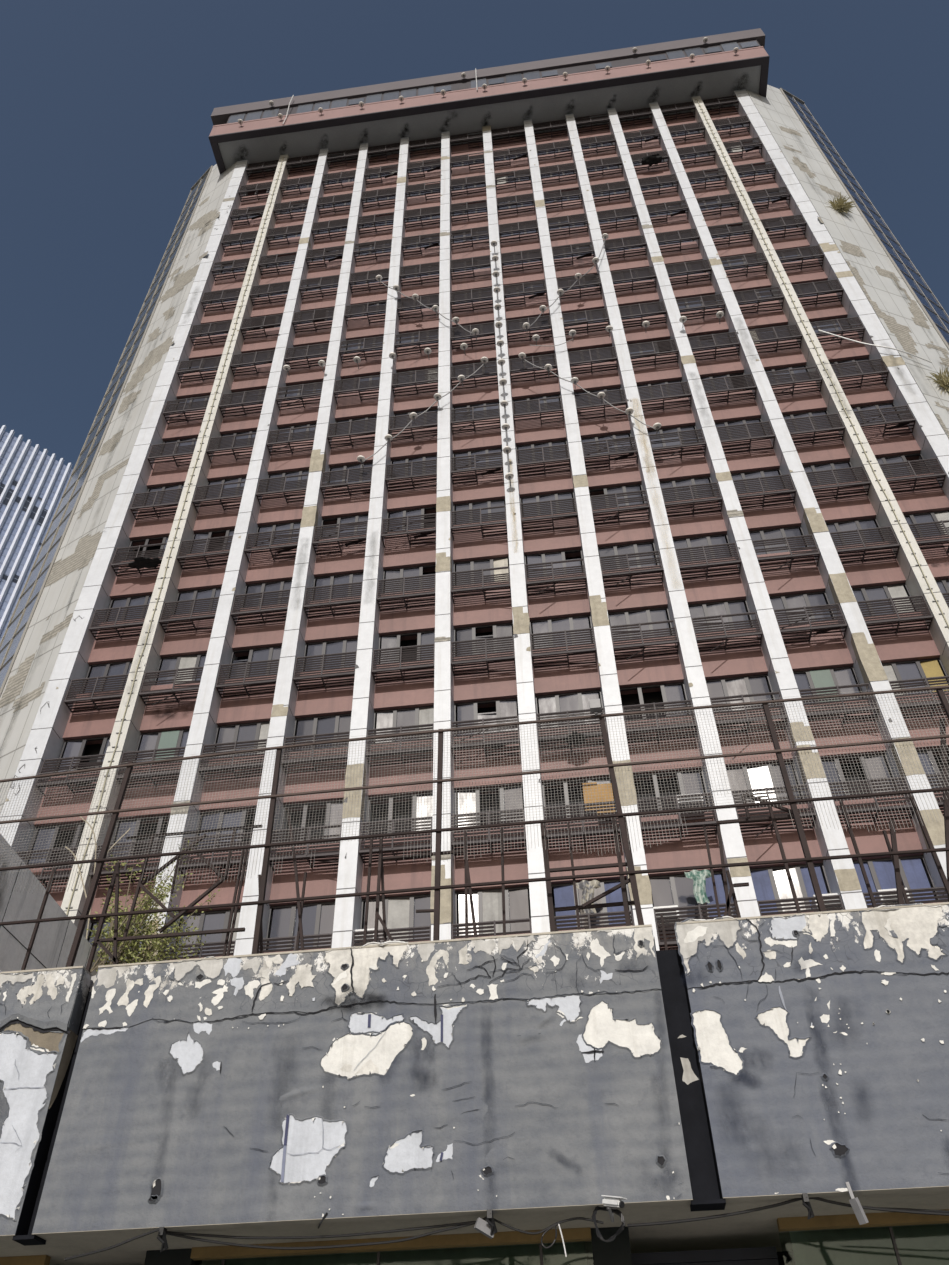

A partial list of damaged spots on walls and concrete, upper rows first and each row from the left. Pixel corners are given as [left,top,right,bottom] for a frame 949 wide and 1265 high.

crack [0,933,658,1049]
peeling [525,926,663,1063]
peeling [674,916,747,992]
peeling [754,914,875,1060]
crack [687,918,949,1010]
peeling [860,903,949,985]
peeling [0,921,568,1222]
peeling [678,1008,745,1085]
crack [435,1081,558,1160]